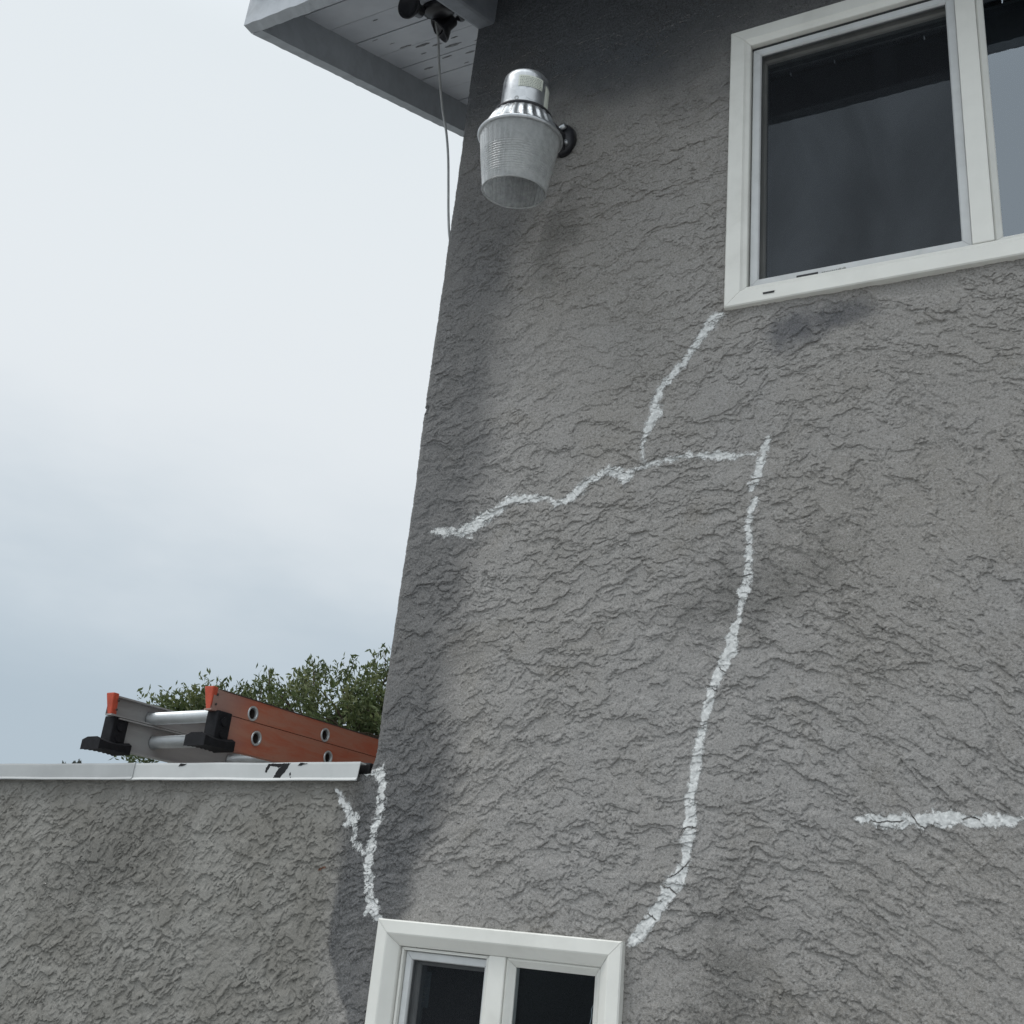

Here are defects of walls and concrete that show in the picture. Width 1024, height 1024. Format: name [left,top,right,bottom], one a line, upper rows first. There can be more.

crack [431,312,771,948]
crack [335,764,387,921]
crack [855,808,1024,830]